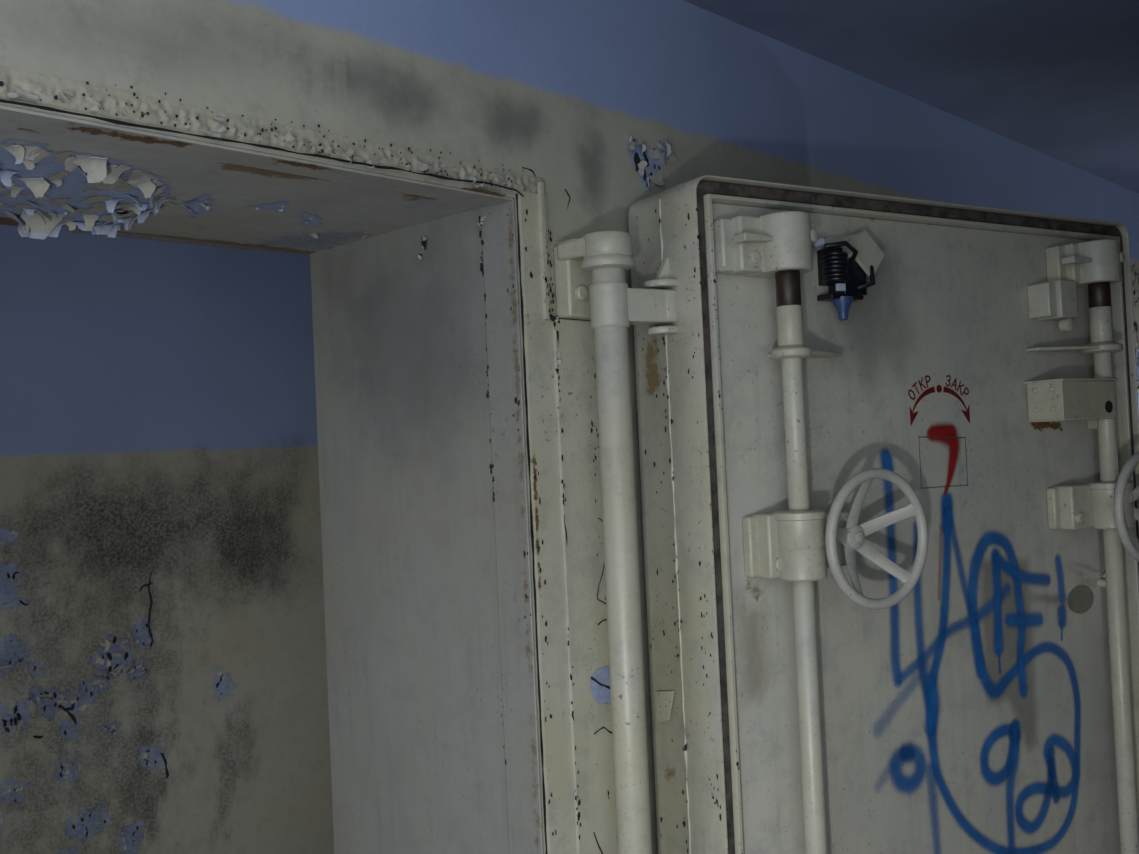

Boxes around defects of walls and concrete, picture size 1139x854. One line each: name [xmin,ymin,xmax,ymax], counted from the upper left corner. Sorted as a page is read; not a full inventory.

peeling [0,139,212,240]
flaking render [0,66,545,195]
peeling [624,133,676,192]
peeling [477,216,486,276]
peeling [530,229,561,392]
crack [0,99,547,854]
peeling [0,526,29,610]
water stain [68,493,275,577]
crack [597,565,607,626]
peeling [0,619,156,744]
peeling [137,745,168,770]
peeling [65,803,145,854]